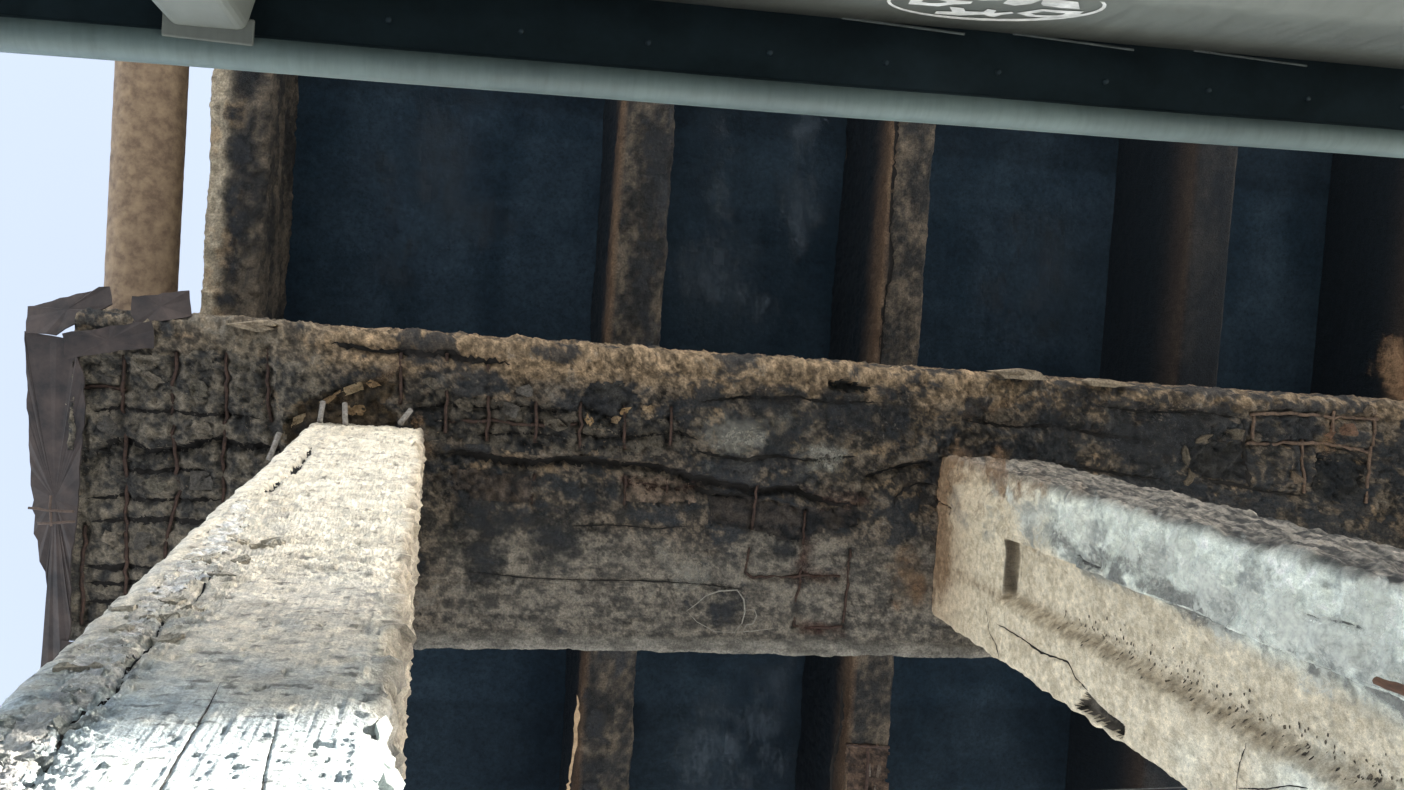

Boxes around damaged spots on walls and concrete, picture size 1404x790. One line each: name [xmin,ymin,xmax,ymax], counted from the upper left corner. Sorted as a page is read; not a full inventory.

water stain [215,71,260,307]
water stain [706,378,780,453]
water stain [807,441,848,471]
peeling [988,368,1048,380]
peeling [1081,378,1136,388]
spalling [1181,405,1379,504]
spalling [0,320,689,790]
water stain [434,465,620,589]
spalling [623,474,860,545]
crack [985,609,1088,691]
crack [30,622,164,789]
crack [160,686,219,790]